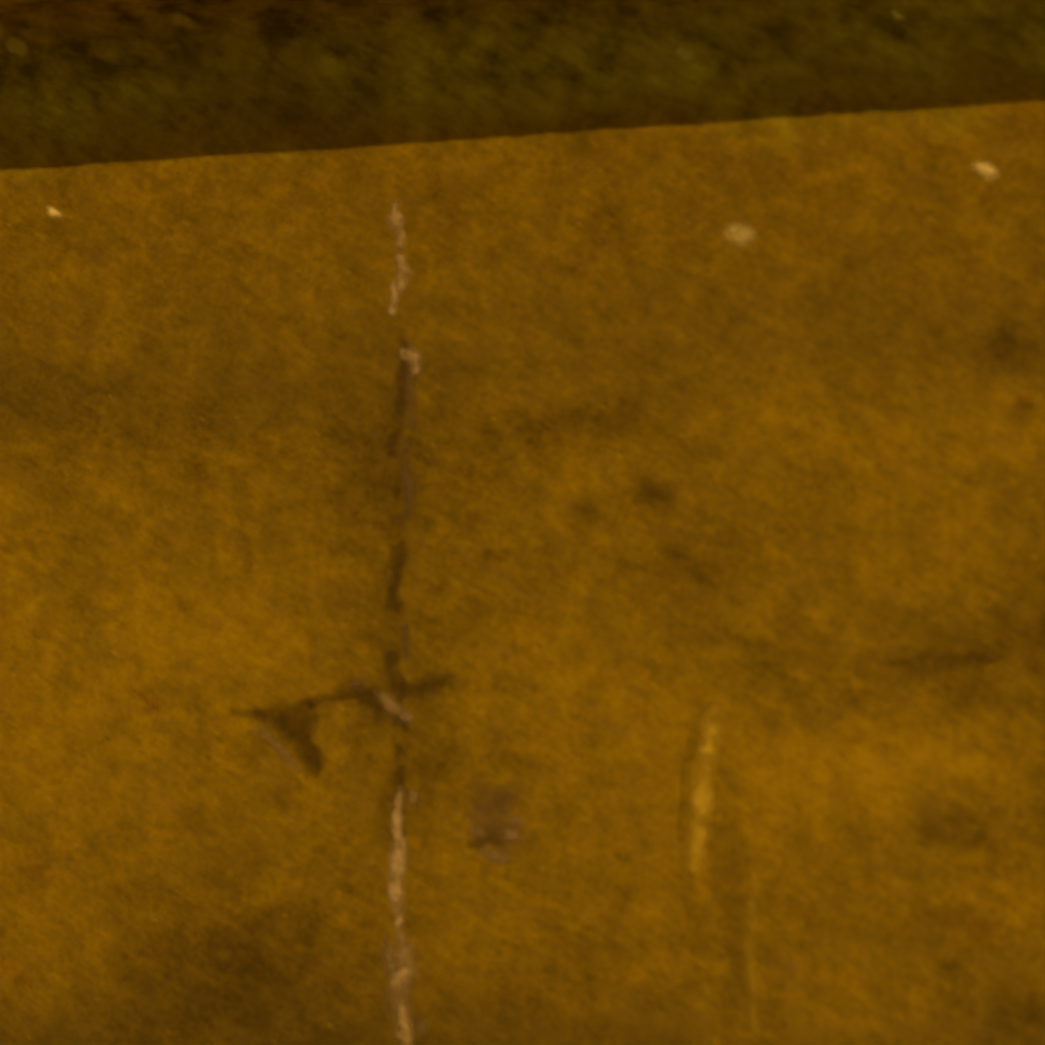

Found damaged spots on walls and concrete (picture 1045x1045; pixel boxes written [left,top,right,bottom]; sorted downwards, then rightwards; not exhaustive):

leakage [385,791,425,1045]